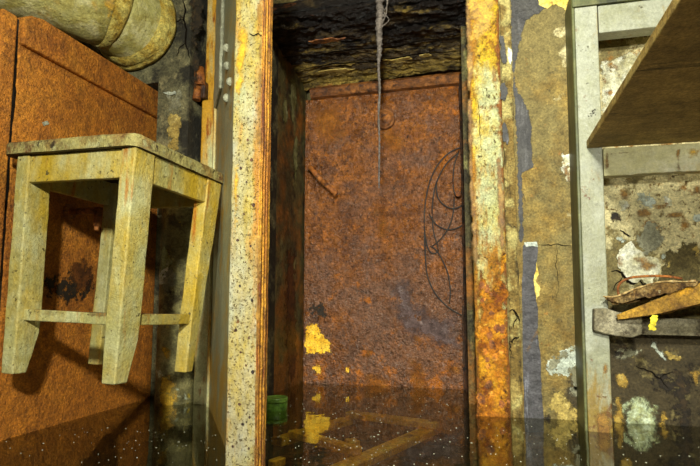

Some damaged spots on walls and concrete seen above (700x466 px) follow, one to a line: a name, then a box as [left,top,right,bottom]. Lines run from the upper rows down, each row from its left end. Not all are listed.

crack [176,0,190,58]
rust [468,100,477,263]
peeling [499,0,578,438]
rust [43,258,94,305]
rust [475,158,510,438]
peeling [615,221,700,284]
crack [636,366,672,388]